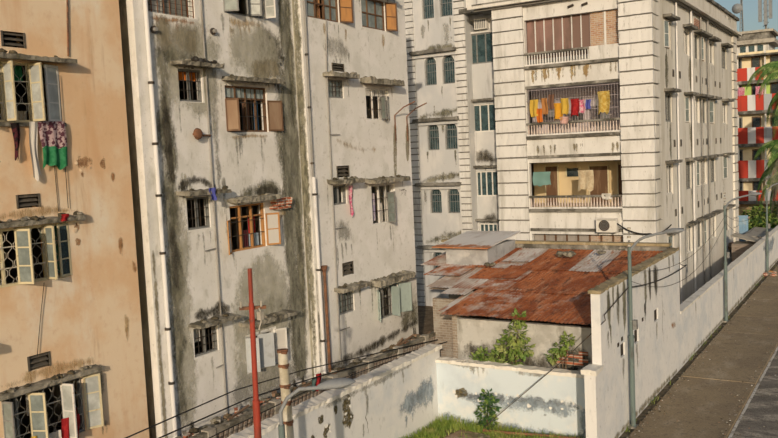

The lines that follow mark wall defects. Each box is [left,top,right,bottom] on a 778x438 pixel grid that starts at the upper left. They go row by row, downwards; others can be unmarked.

damp [230,0,286,92]
damp [154,18,225,200]
damp [170,175,304,429]
damp [607,282,626,335]
damp [644,267,658,311]
peeling [334,394,354,428]
damp [401,377,434,424]